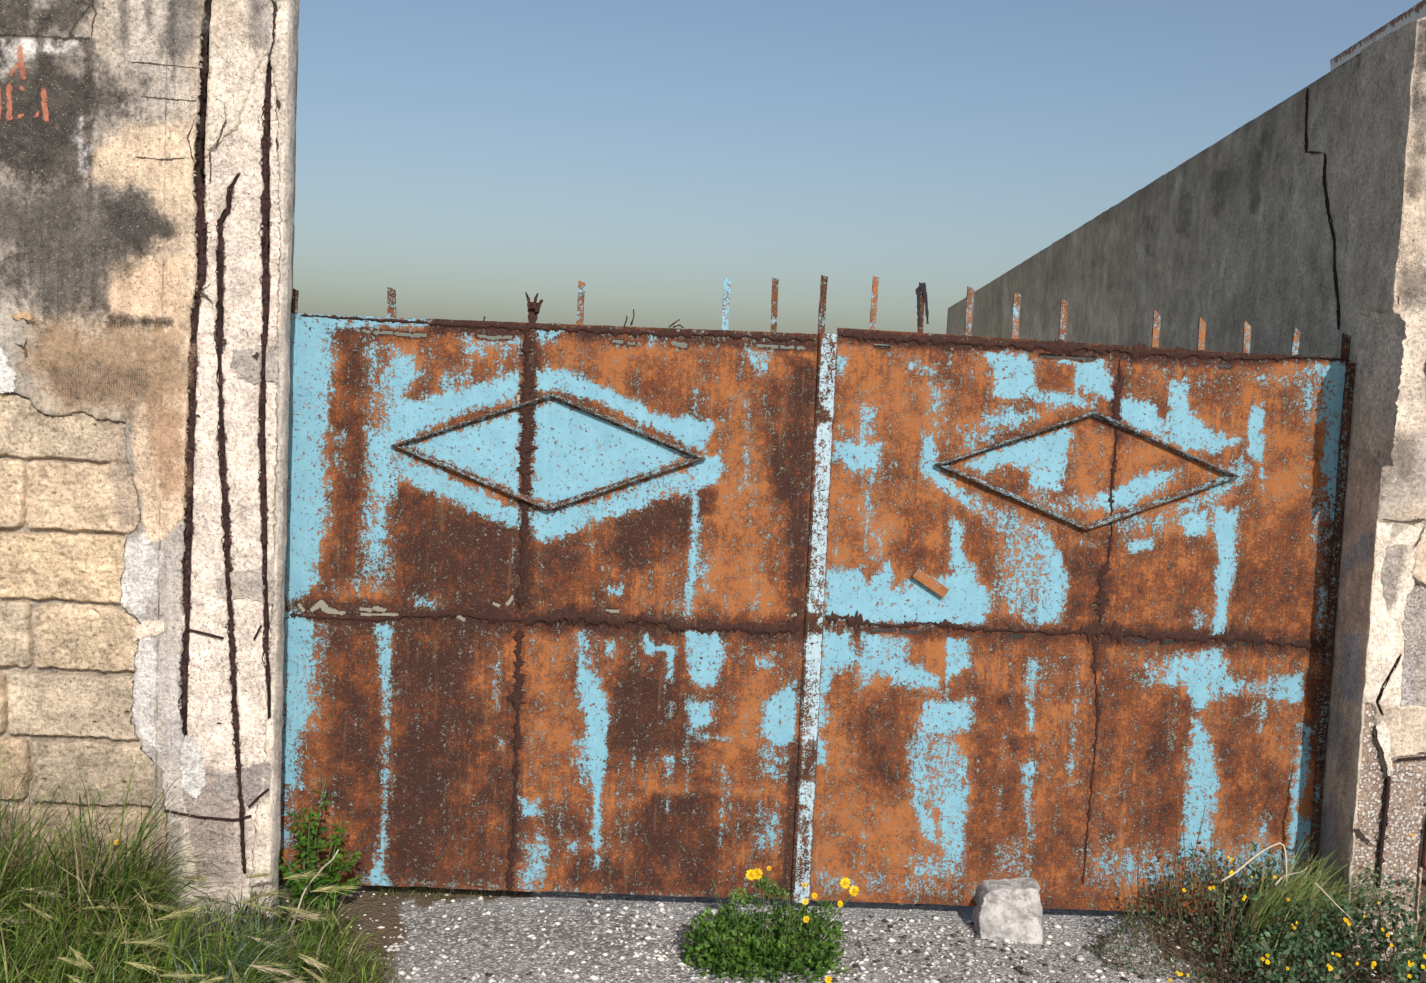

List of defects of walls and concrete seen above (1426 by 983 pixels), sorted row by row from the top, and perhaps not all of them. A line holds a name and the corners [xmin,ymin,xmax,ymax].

spalling [10,311,38,324]
flaking render [0,349,168,910]
damp [0,0,173,328]
crack [131,0,278,874]
spalling [180,56,281,889]
crack [1304,88,1340,330]
crack [1382,518,1426,585]
spalling [1351,703,1426,932]